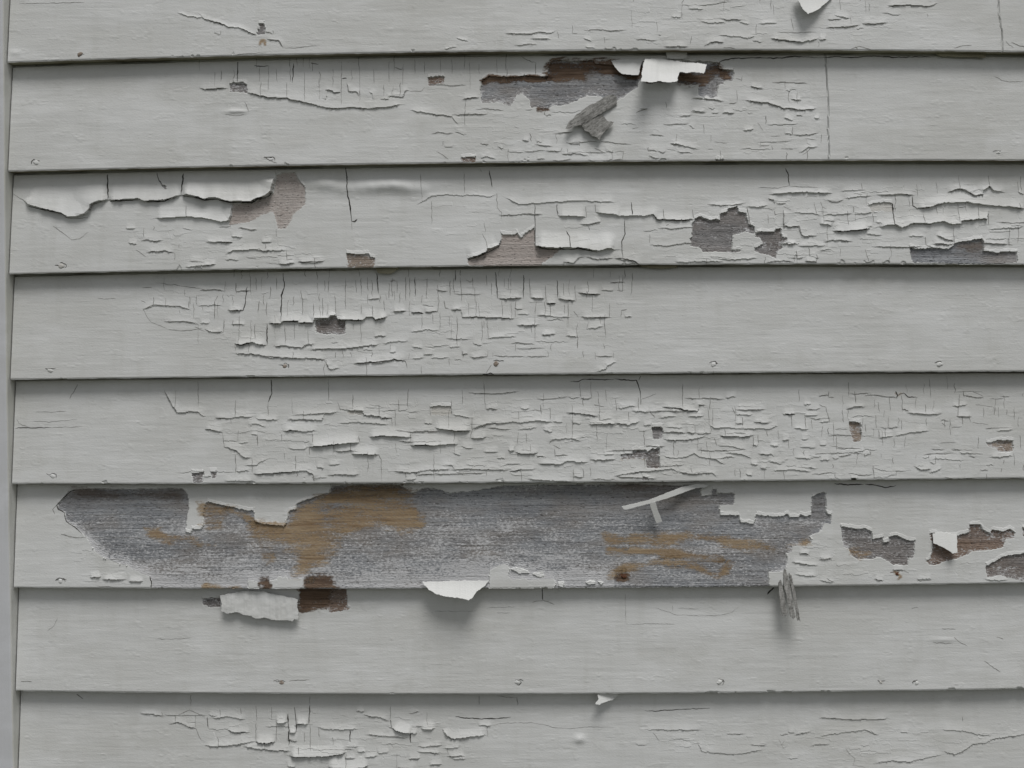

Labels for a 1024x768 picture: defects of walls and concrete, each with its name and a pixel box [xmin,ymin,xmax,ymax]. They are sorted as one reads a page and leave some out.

crack [345,168,357,222]
peeling [20,0,1024,621]
crack [571,376,641,399]
crack [456,679,583,729]